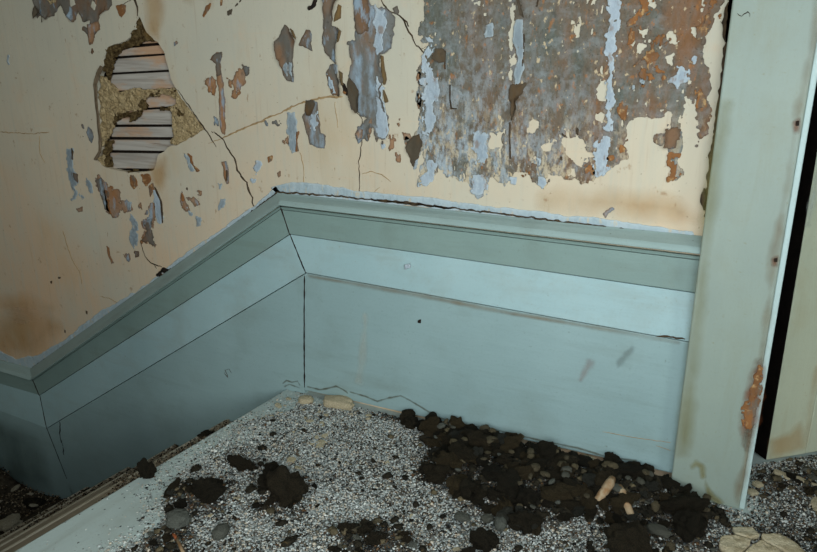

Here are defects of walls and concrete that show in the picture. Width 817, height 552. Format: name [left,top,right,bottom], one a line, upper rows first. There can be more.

peeling [372,4,387,55]
spalling [81,17,204,173]
peeling [205,76,217,96]
peeling [327,64,348,96]
peeling [264,112,299,153]
peeling [309,111,320,131]
peeling [123,190,164,262]
crack [178,90,644,388]
rust [741,364,763,437]